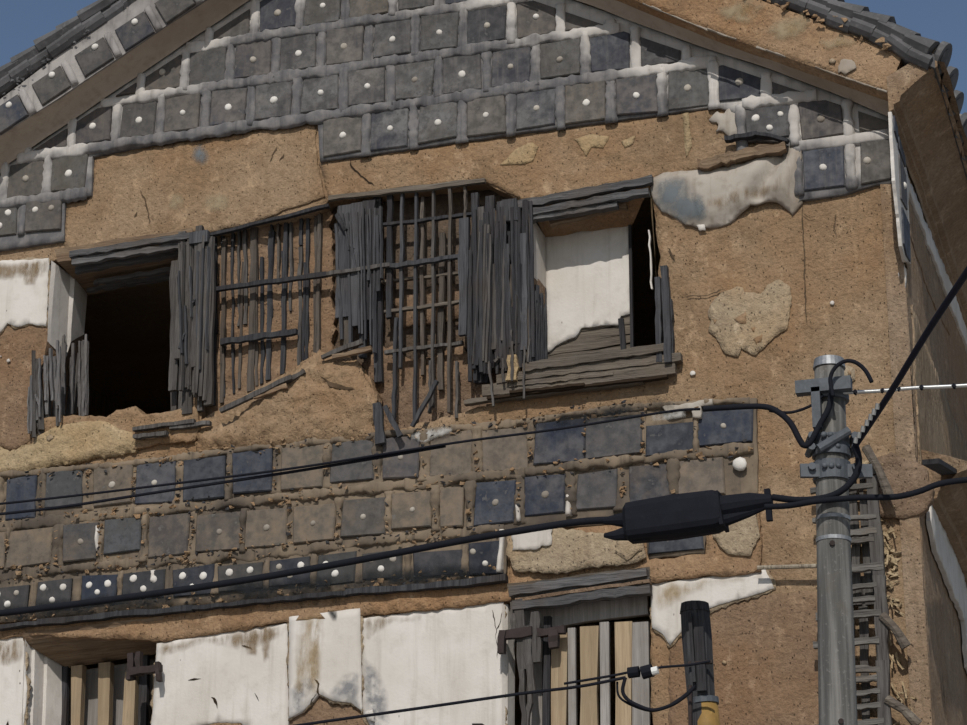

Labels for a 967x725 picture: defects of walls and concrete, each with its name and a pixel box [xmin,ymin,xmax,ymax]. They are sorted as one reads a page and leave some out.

leakage [0,264,38,282]
spalling [708,279,792,357]
flaking render [0,325,48,451]
flaking render [289,696,375,725]